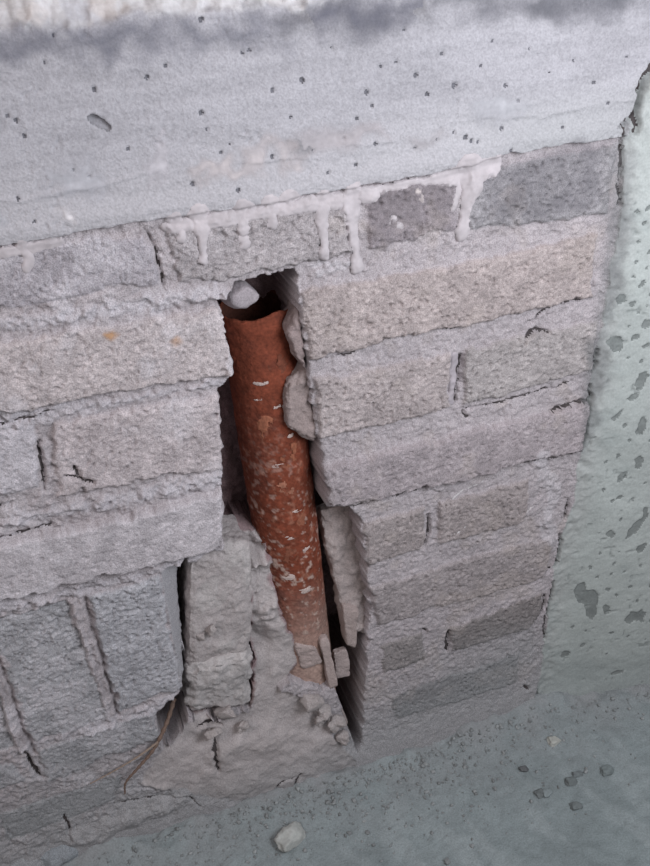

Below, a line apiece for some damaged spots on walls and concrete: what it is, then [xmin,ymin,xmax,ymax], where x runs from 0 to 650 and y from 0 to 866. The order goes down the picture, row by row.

crack [615,63,650,205]
crack [525,298,581,338]
crack [453,354,590,418]
crack [0,409,50,425]
rust [257,416,273,441]
crack [37,440,45,482]
crack [66,465,93,483]
crack [0,522,52,537]
spalling [177,514,253,711]
crack [197,719,220,769]